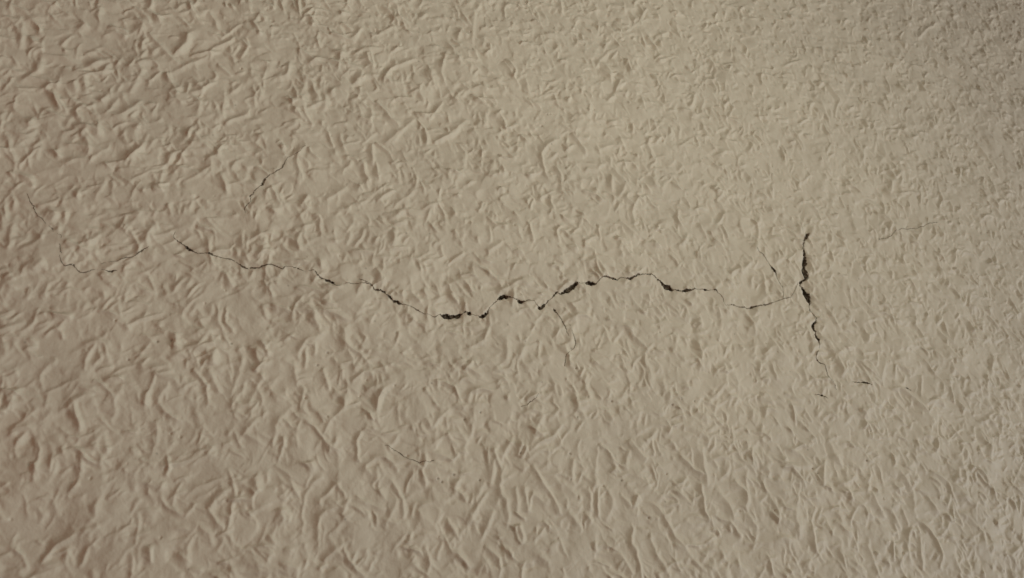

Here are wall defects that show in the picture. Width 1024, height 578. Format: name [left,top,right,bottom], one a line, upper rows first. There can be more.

crack [174,233,872,398]